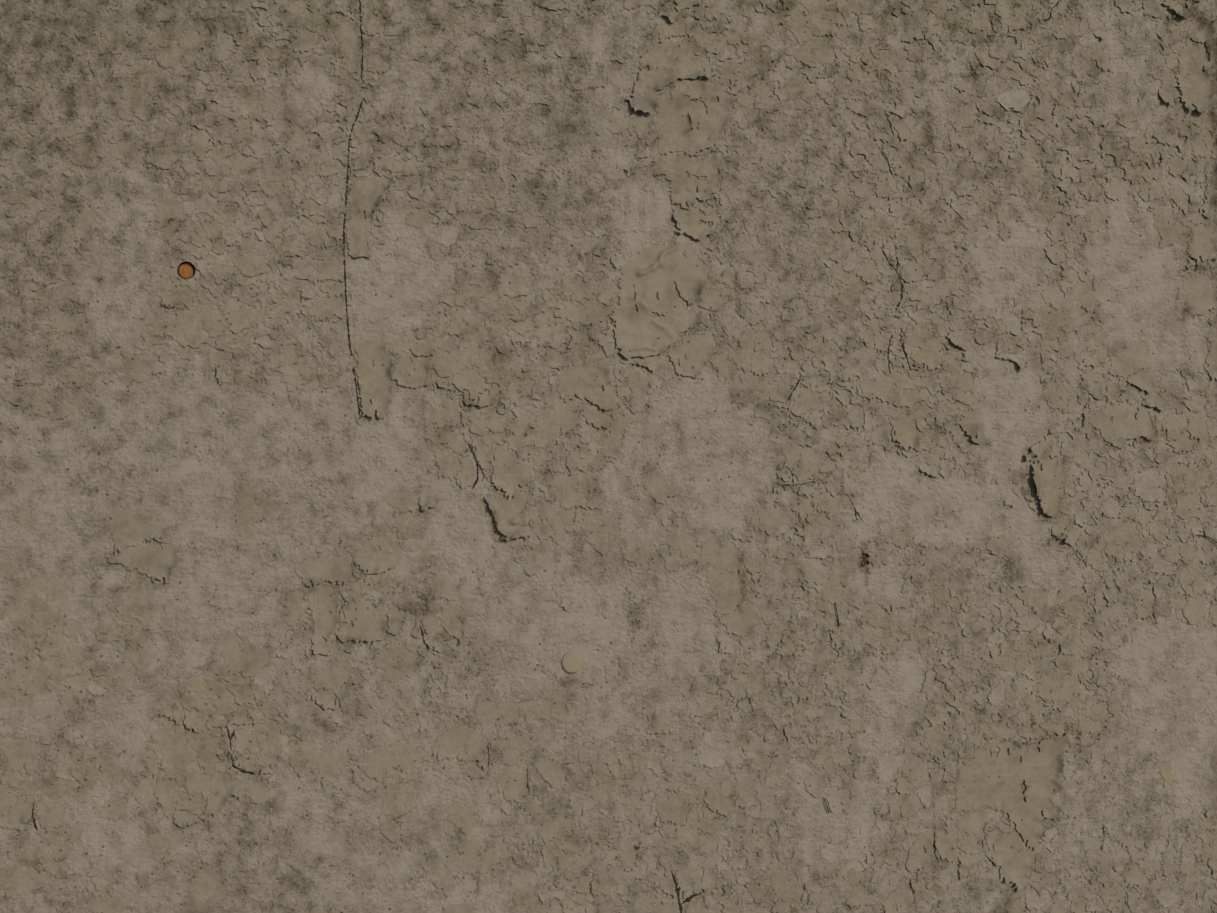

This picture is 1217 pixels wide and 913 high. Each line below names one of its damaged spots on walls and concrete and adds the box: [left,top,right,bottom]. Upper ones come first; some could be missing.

crack [342,0,365,416]
crack [671,870,701,913]